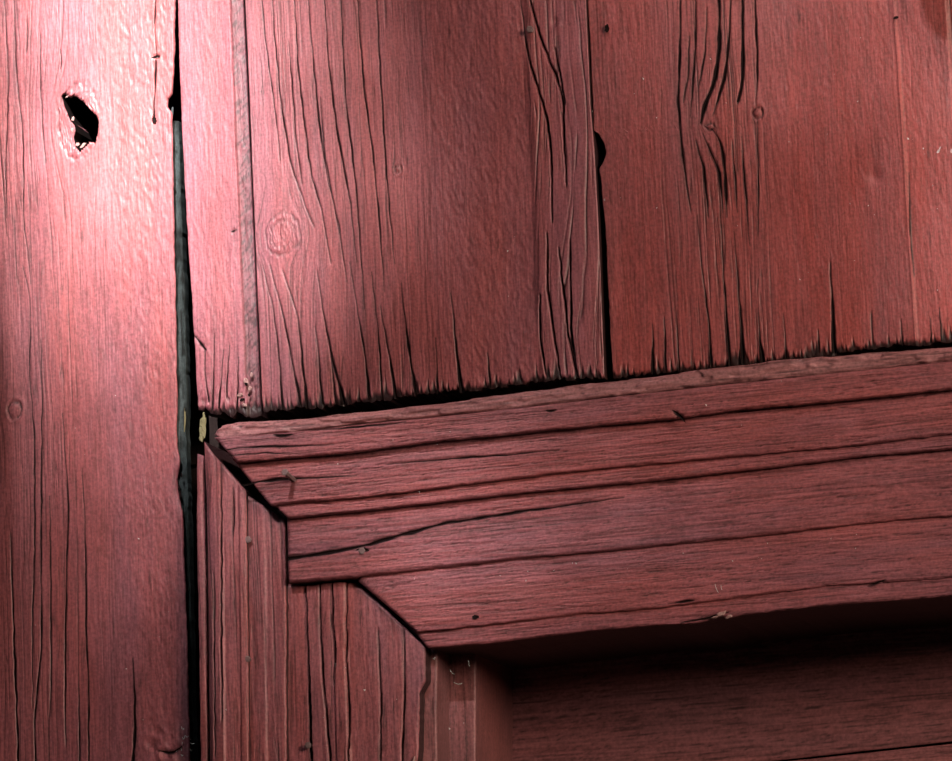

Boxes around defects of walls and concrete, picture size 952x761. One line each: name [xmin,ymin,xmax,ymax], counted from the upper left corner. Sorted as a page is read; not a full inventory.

crack [520,0,567,214]
crack [651,0,787,374]
crack [130,670,138,761]